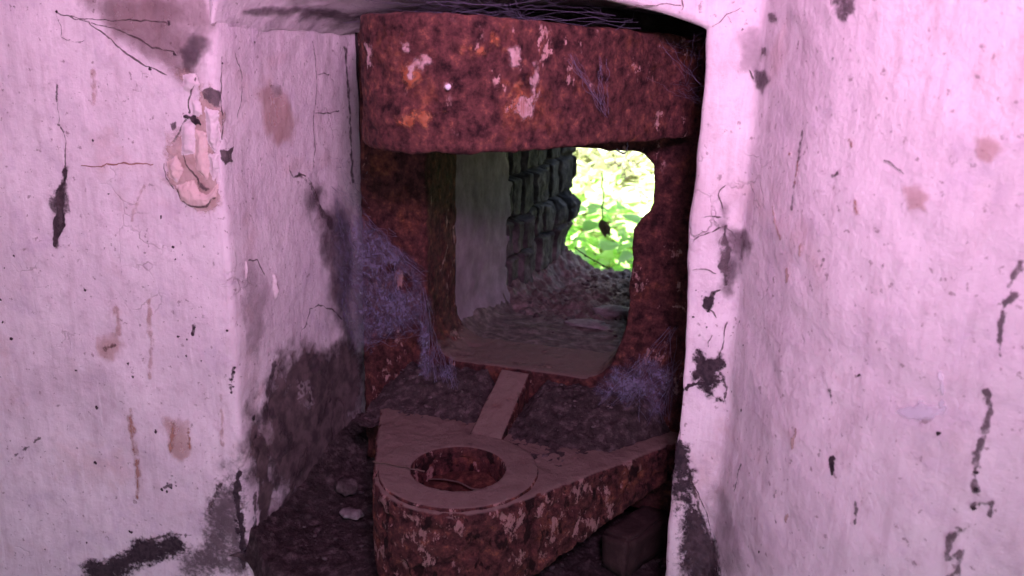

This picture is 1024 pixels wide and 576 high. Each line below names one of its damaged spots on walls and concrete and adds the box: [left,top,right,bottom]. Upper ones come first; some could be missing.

crack [55,10,173,75]
flaking render [164,68,234,211]
rust [398,110,431,128]
damp [695,186,750,297]
rust [129,416,140,499]
damp [79,337,364,576]